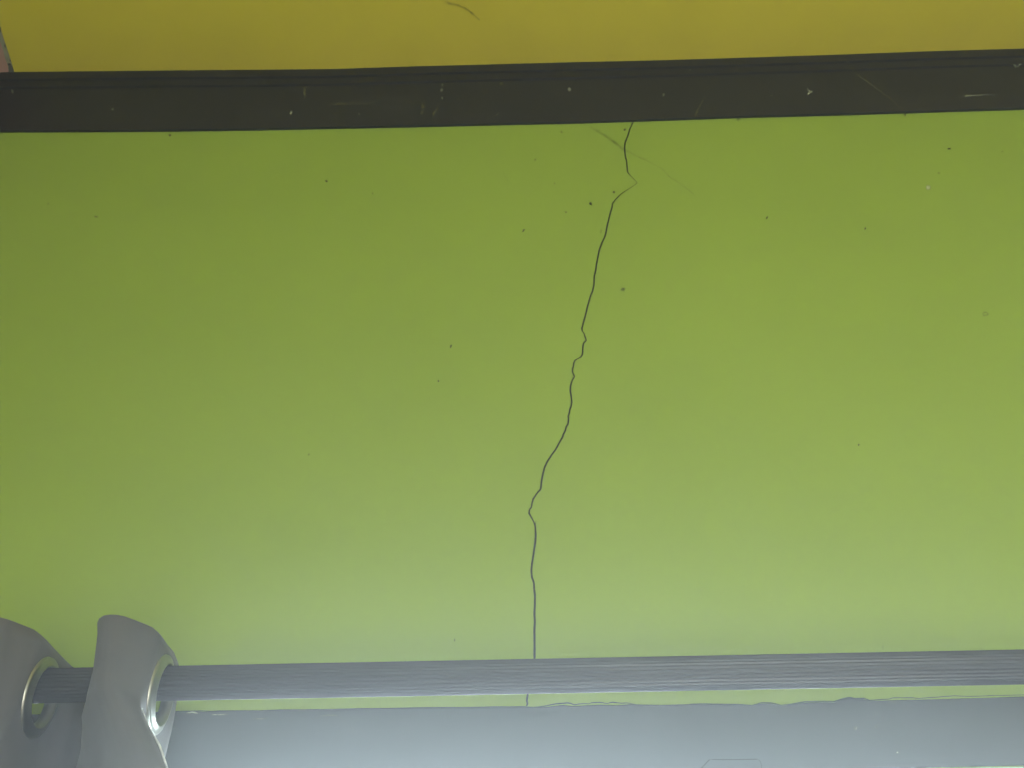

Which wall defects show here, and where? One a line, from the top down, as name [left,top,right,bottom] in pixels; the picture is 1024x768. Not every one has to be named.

crack [528,122,637,659]